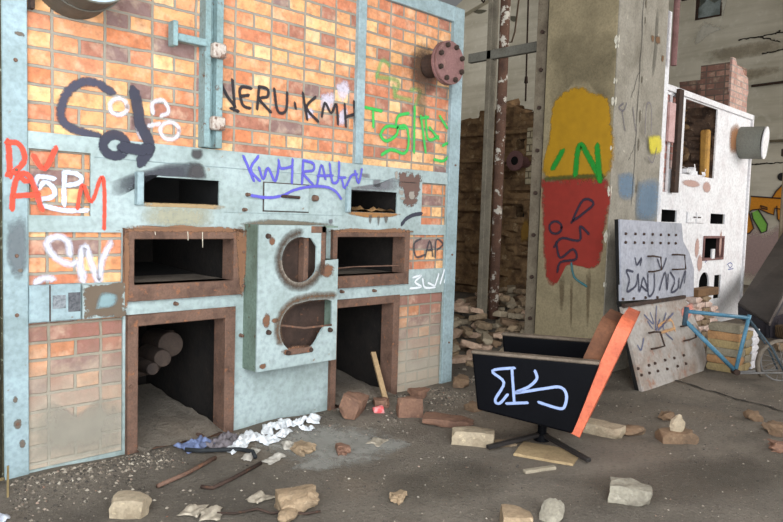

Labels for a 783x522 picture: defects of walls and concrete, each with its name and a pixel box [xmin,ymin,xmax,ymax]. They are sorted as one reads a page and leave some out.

crack [738,30,783,55]
corrosion [83,203,413,319]